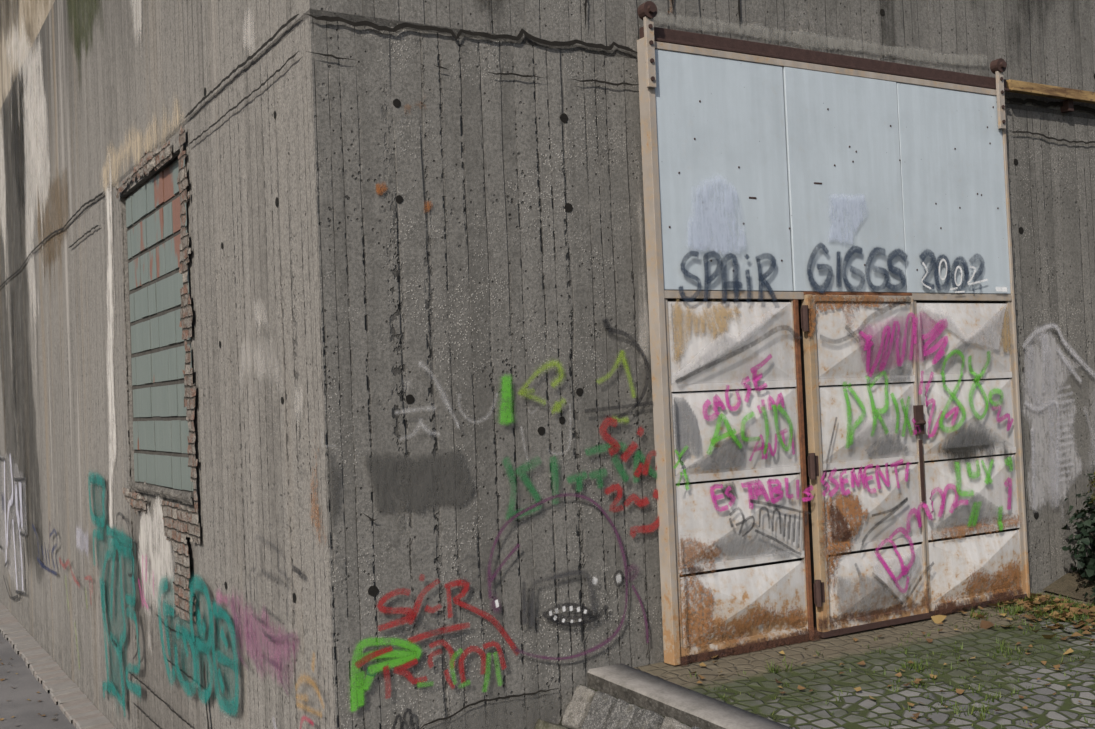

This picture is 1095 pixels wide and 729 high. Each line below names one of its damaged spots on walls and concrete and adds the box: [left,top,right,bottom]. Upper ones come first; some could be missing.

crack [185,0,638,145]
crack [1005,98,1095,144]
water stain [0,33,49,569]
spalling [116,125,200,623]
corrosion [819,492,868,584]
corrosion [678,538,1023,666]